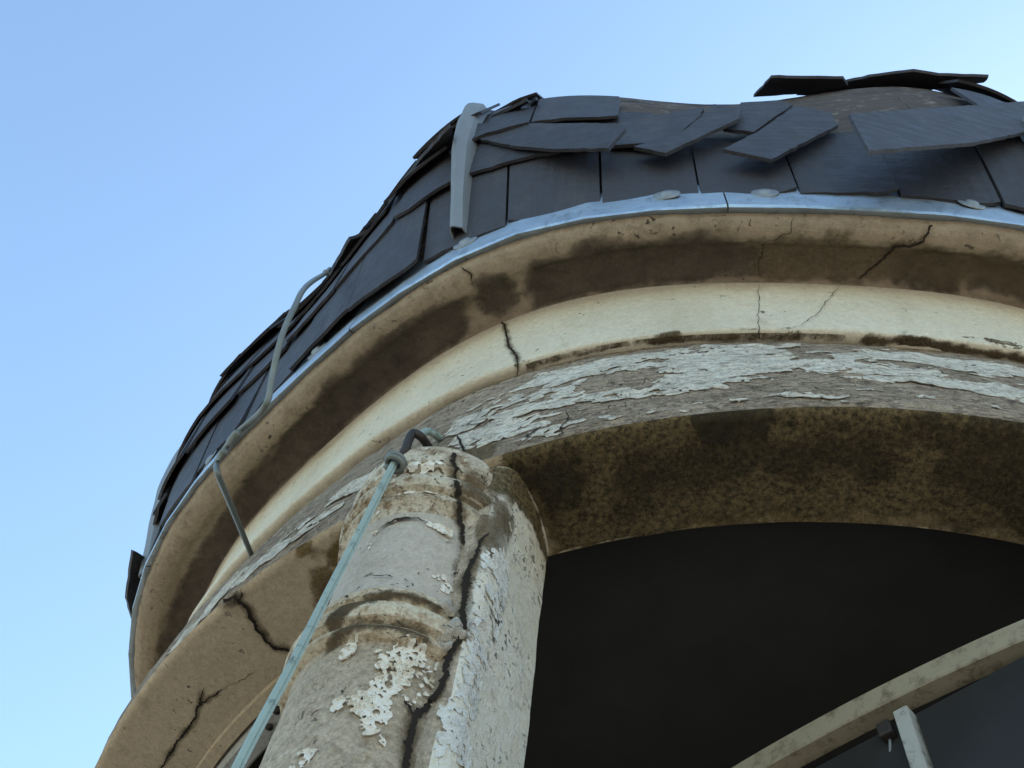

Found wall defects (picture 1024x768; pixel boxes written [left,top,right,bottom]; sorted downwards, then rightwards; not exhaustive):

crack [161,672,254,768]
crack [223,588,290,652]
peeling [168,464,380,654]
peeling [330,634,439,747]
crack [378,517,429,530]
peeling [385,460,443,496]
crack [402,407,491,768]
peeling [432,548,509,768]
crack [501,322,519,377]
leakage [158,230,1024,658]
peeling [443,343,1024,451]
peeling [962,336,1023,349]